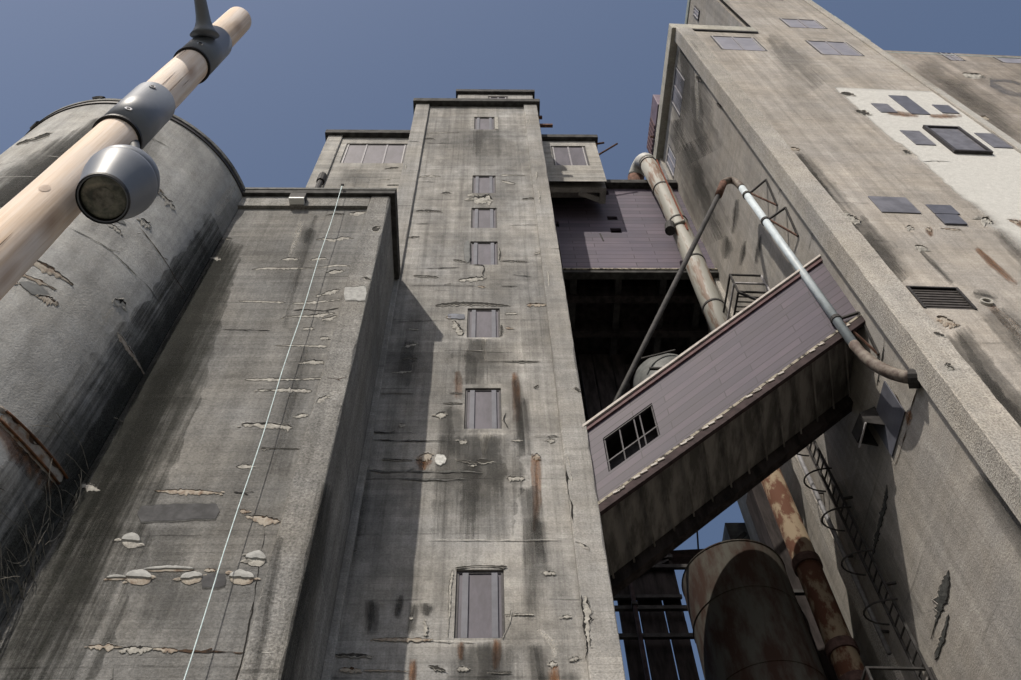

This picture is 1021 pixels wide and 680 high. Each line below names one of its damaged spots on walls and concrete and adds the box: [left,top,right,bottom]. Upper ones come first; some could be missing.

damp [0,119,96,209]
spalling [15,260,74,306]
spalling [103,550,266,585]
peeling [931,570,950,660]